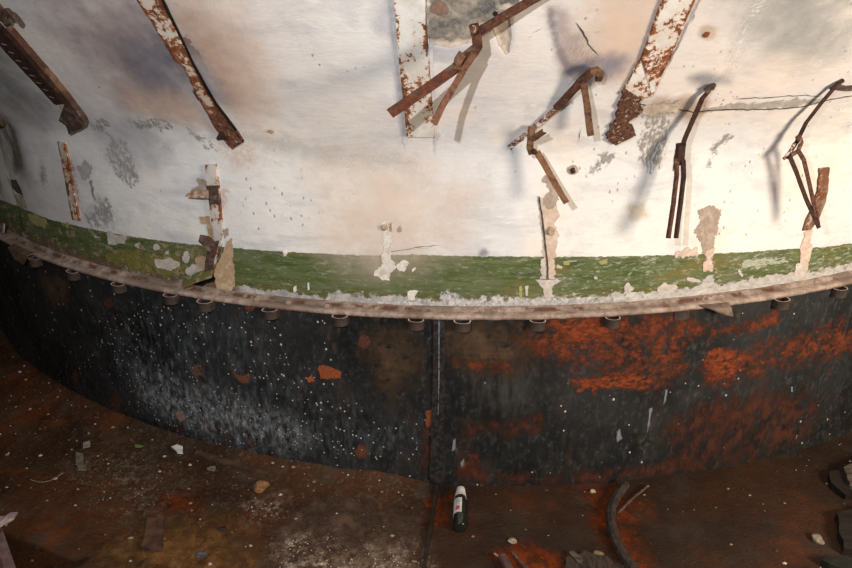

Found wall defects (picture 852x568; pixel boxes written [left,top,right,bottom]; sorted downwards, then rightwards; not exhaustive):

spalling [427,0,519,55]
rust [701,27,714,38]
rust [191,21,254,113]
crack [641,95,851,117]
peeling [77,161,112,220]
peeling [107,138,138,188]
peeling [53,231,206,279]
peeling [199,216,235,291]
peeling [374,175,852,306]
efflorescence [99,307,384,466]
rust [519,310,778,393]
rust [704,319,852,387]